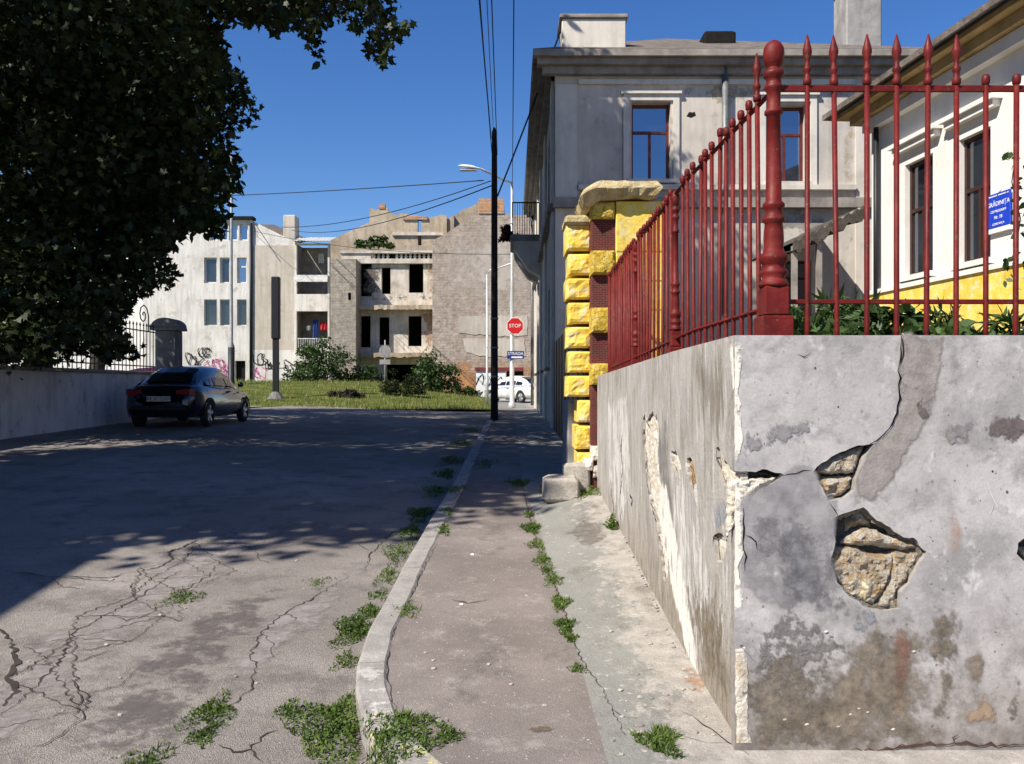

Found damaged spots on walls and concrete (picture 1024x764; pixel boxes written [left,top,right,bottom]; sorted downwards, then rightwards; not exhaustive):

flaking render [645,412,698,578]
crack [741,469,808,477]
flaking render [813,333,943,610]
crack [868,336,904,446]
water stain [743,519,984,748]